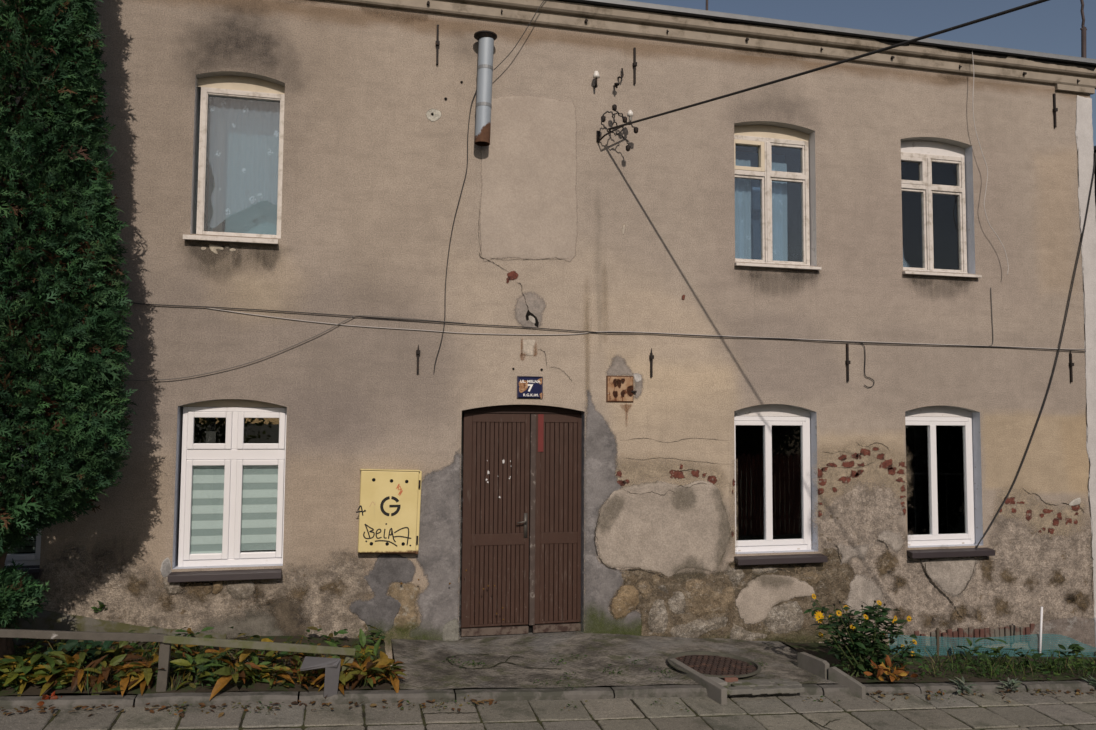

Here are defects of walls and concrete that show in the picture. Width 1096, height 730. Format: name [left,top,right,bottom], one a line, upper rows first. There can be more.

spalling [526,310,539,327]
flaking render [615,459,735,494]
peeling [730,444,1095,652]
peeling [37,548,375,638]
peeling [388,581,420,630]